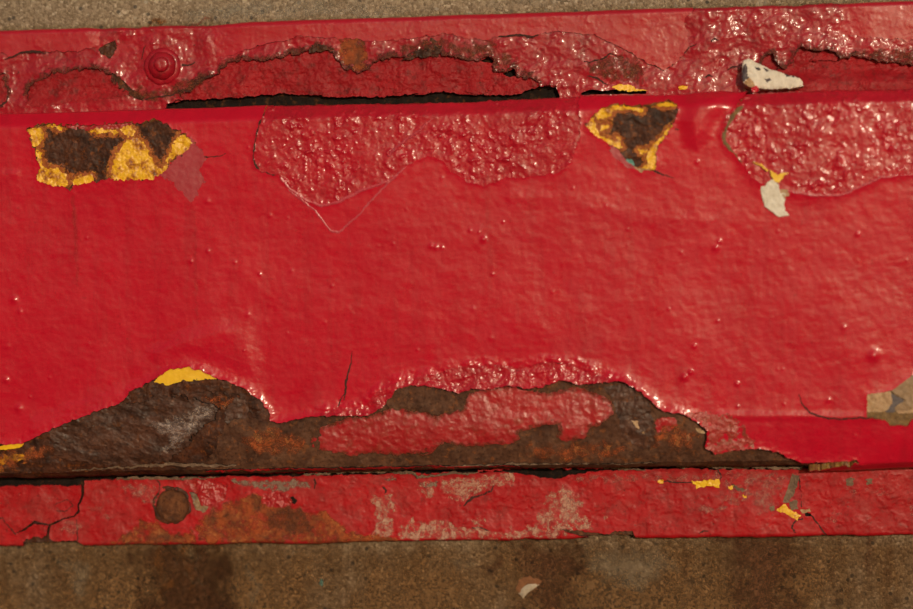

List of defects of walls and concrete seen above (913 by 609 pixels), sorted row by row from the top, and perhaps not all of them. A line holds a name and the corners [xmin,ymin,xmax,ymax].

peeling [23,41,145,107]
peeling [168,38,557,105]
peeling [759,45,913,93]
peeling [27,120,206,202]
peeling [585,101,679,173]
peeling [753,161,790,217]
peeling [867,374,913,426]
peeling [0,361,830,520]
crack [0,476,88,541]
spalling [24,534,78,543]
rust [111,494,397,545]
peeling [372,489,634,541]